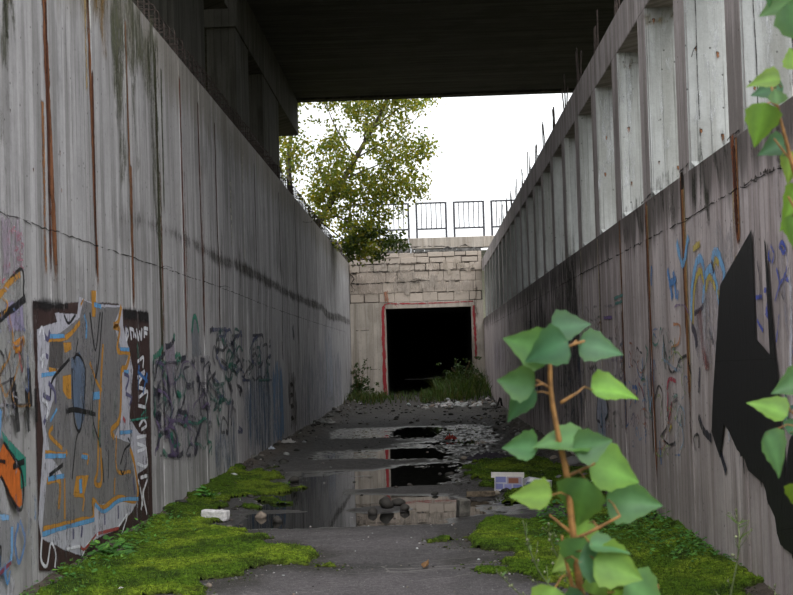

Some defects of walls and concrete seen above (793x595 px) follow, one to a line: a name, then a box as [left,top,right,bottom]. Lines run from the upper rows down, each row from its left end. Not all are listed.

corrosion [41,0,58,274]
crack [0,211,366,332]
water stain [510,255,583,331]
crack [514,165,782,312]
corrosion [680,172,692,439]
corrosion [730,134,740,243]
water stain [533,330,586,426]